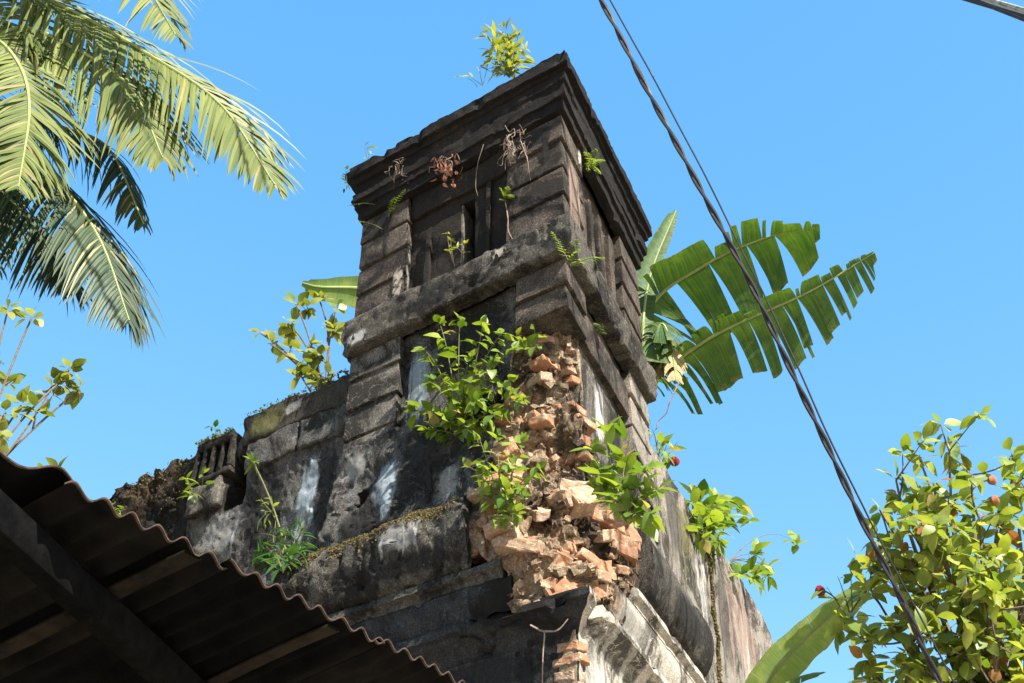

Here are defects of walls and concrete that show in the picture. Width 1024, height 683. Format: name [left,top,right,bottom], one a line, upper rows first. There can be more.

water stain [294,449,363,546]
water stain [376,465,395,517]
spalling [466,331,642,628]